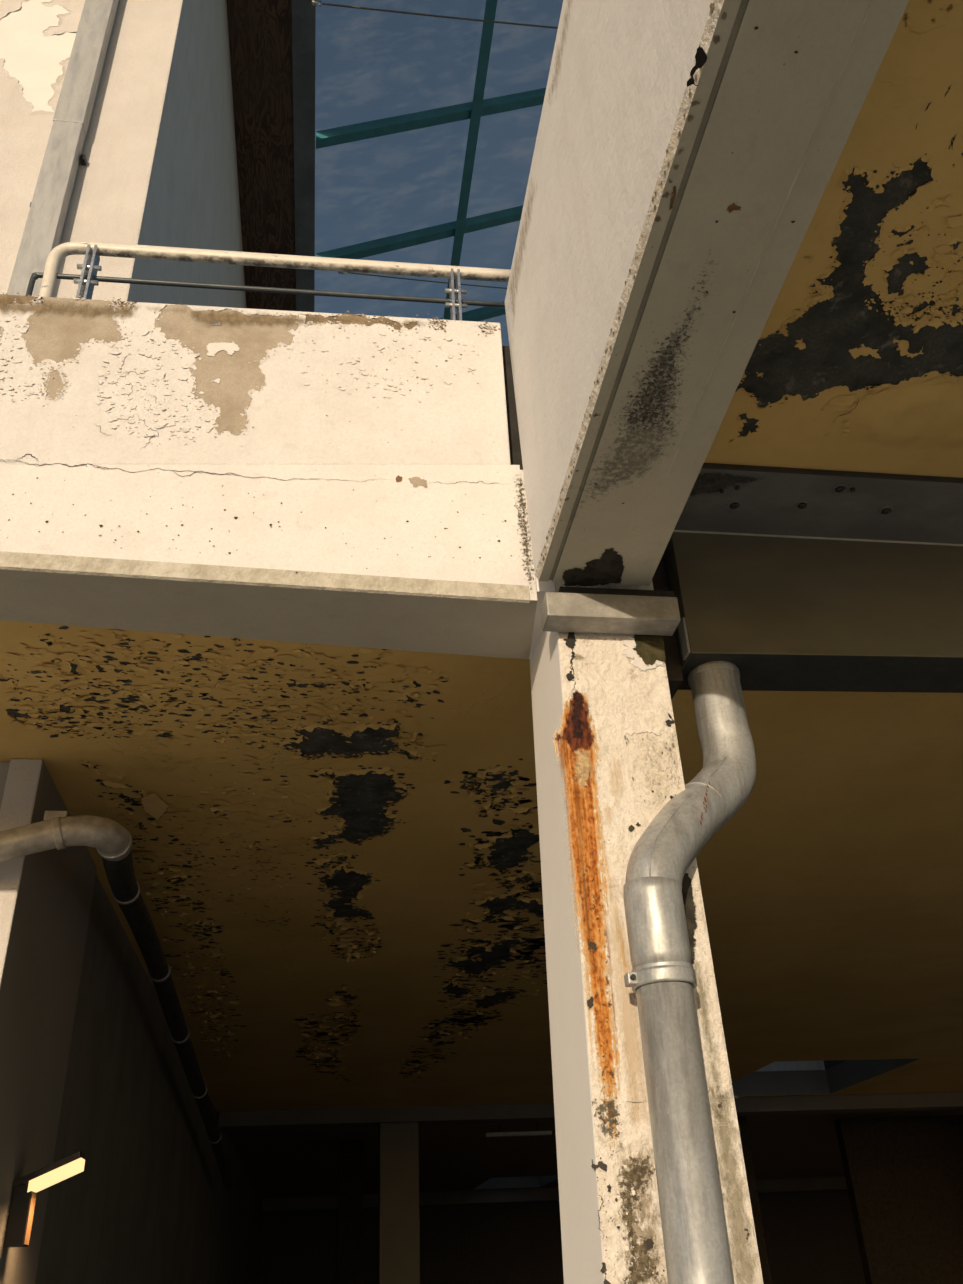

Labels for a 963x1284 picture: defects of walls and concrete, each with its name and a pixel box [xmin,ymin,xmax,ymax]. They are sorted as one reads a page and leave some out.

flaking render [0,0,77,115]
crack [3,355,370,482]
leakage [593,267,706,491]
peeling [729,154,963,442]
peeling [0,626,449,962]
peeling [399,758,547,1082]
corrosion [553,691,624,1149]
leakage [592,1097,666,1284]